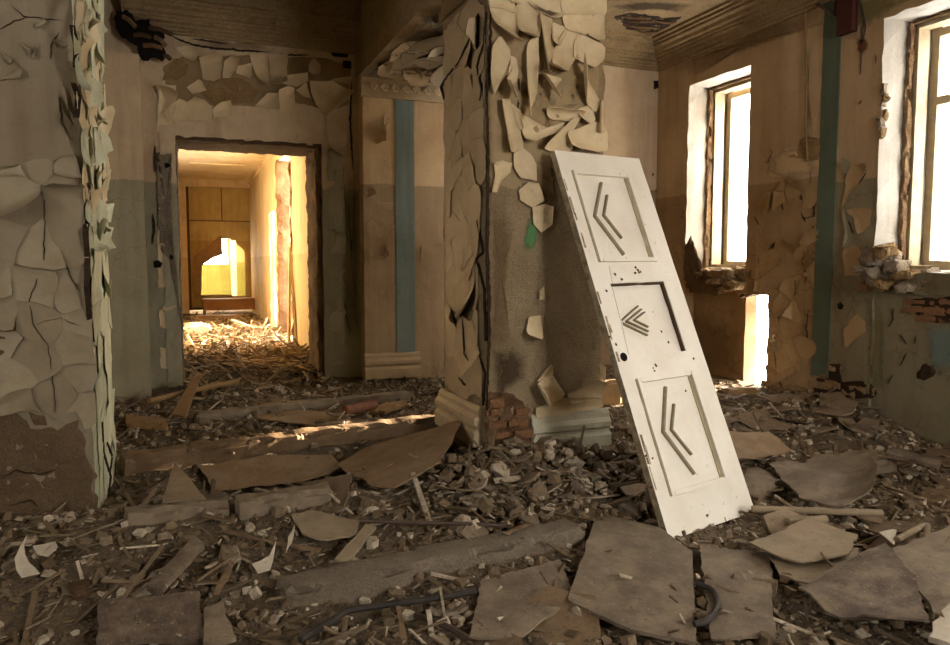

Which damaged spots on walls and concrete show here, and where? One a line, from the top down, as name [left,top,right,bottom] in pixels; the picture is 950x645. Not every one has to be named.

crack [0,6,82,135]
crack [29,183,95,407]
peeling [0,0,356,519]
peeling [368,0,681,451]
peeling [683,75,877,399]
peeling [841,9,950,348]
crack [99,422,113,497]